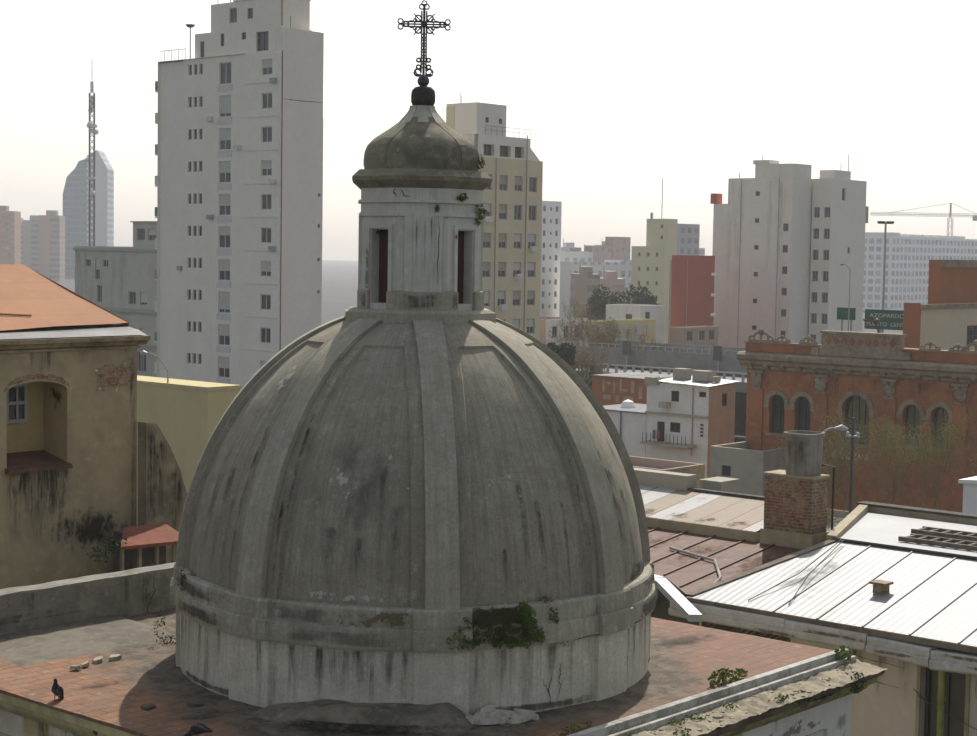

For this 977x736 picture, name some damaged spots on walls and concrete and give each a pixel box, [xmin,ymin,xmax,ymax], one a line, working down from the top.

spalling [95,363,137,392]
crack [543,665,564,702]